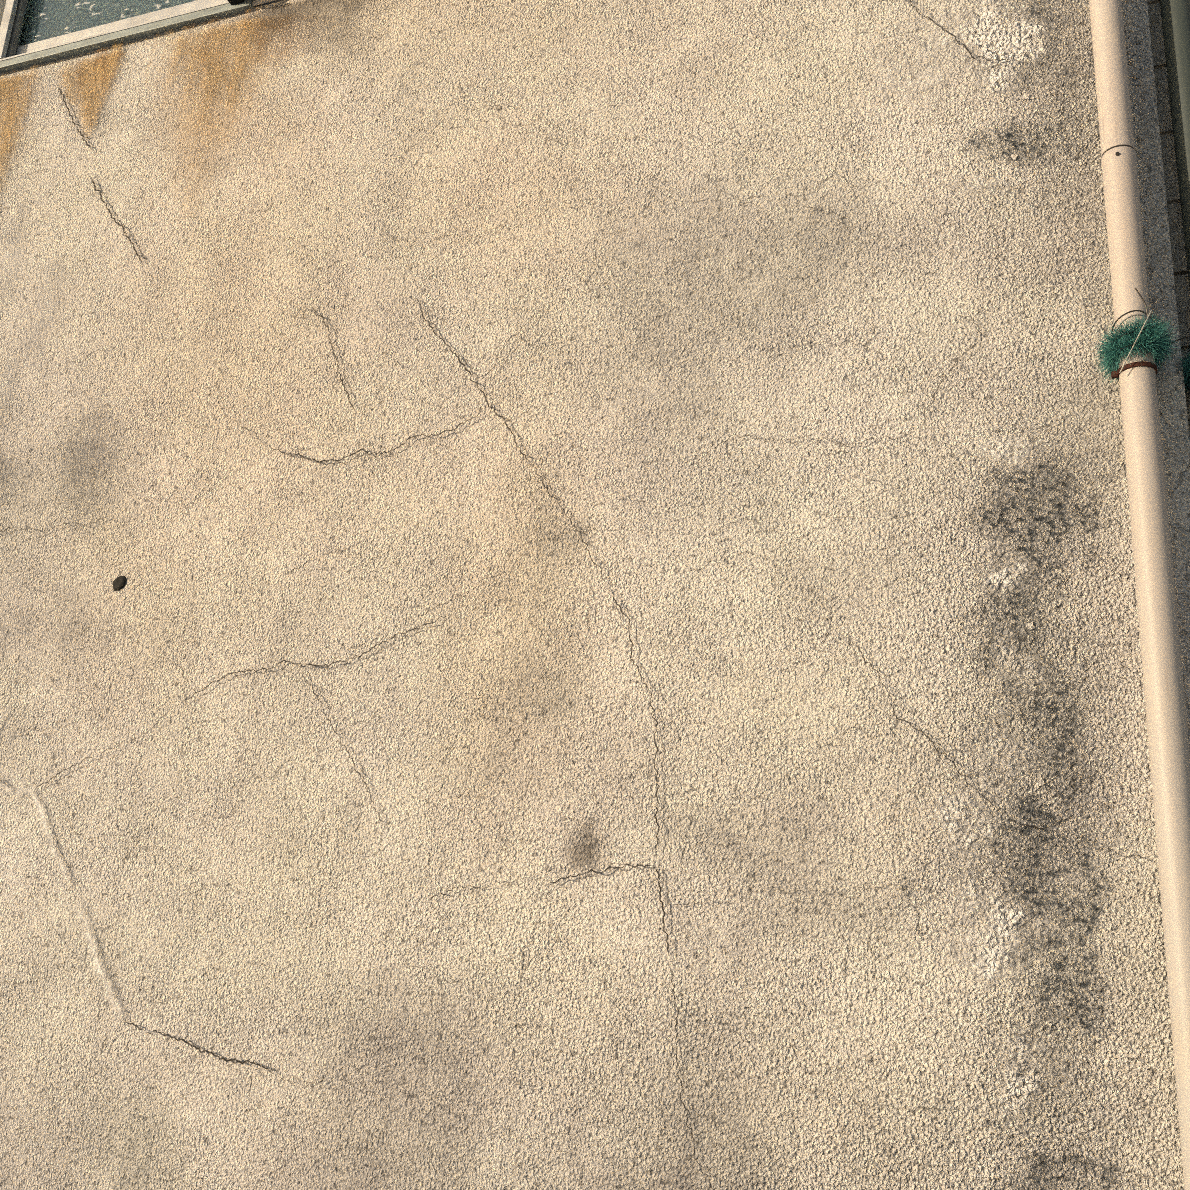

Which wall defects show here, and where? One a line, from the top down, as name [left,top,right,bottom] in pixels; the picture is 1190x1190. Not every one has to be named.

crack [910,0,1019,101]
crack [59,87,142,262]
water stain [970,461,1098,695]
crack [0,615,448,825]
crack [229,299,714,1190]
water stain [1023,681,1083,799]
water stain [990,799,1106,1030]
crack [101,1022,324,1084]